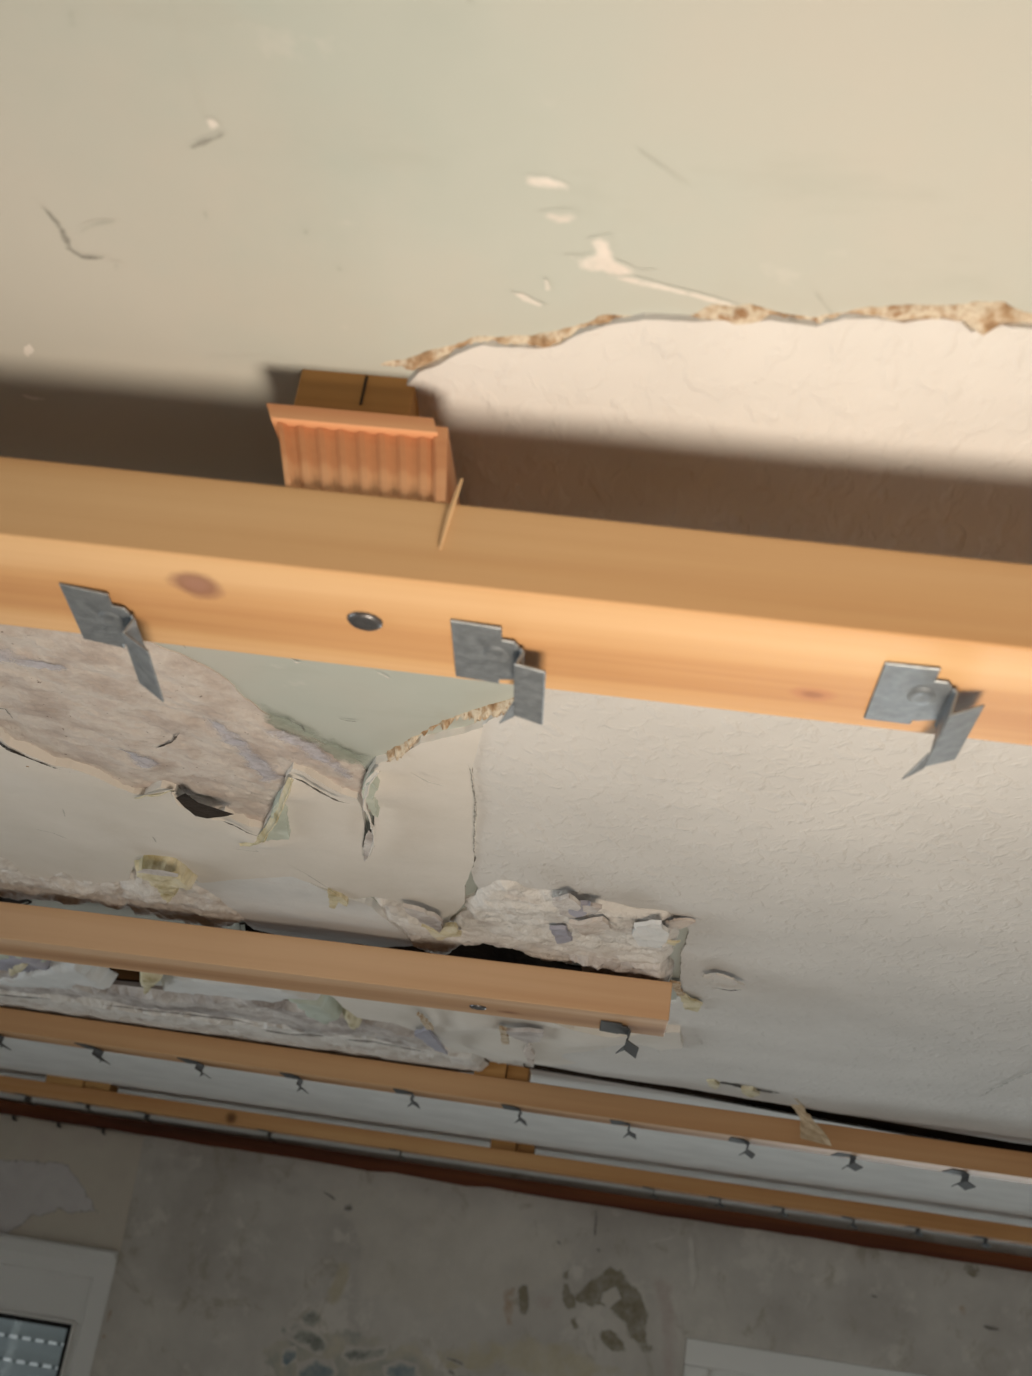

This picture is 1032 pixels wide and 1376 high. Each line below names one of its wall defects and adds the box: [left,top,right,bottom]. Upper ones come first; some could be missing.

crack [31,200,124,273]
peeling [0,624,703,1073]